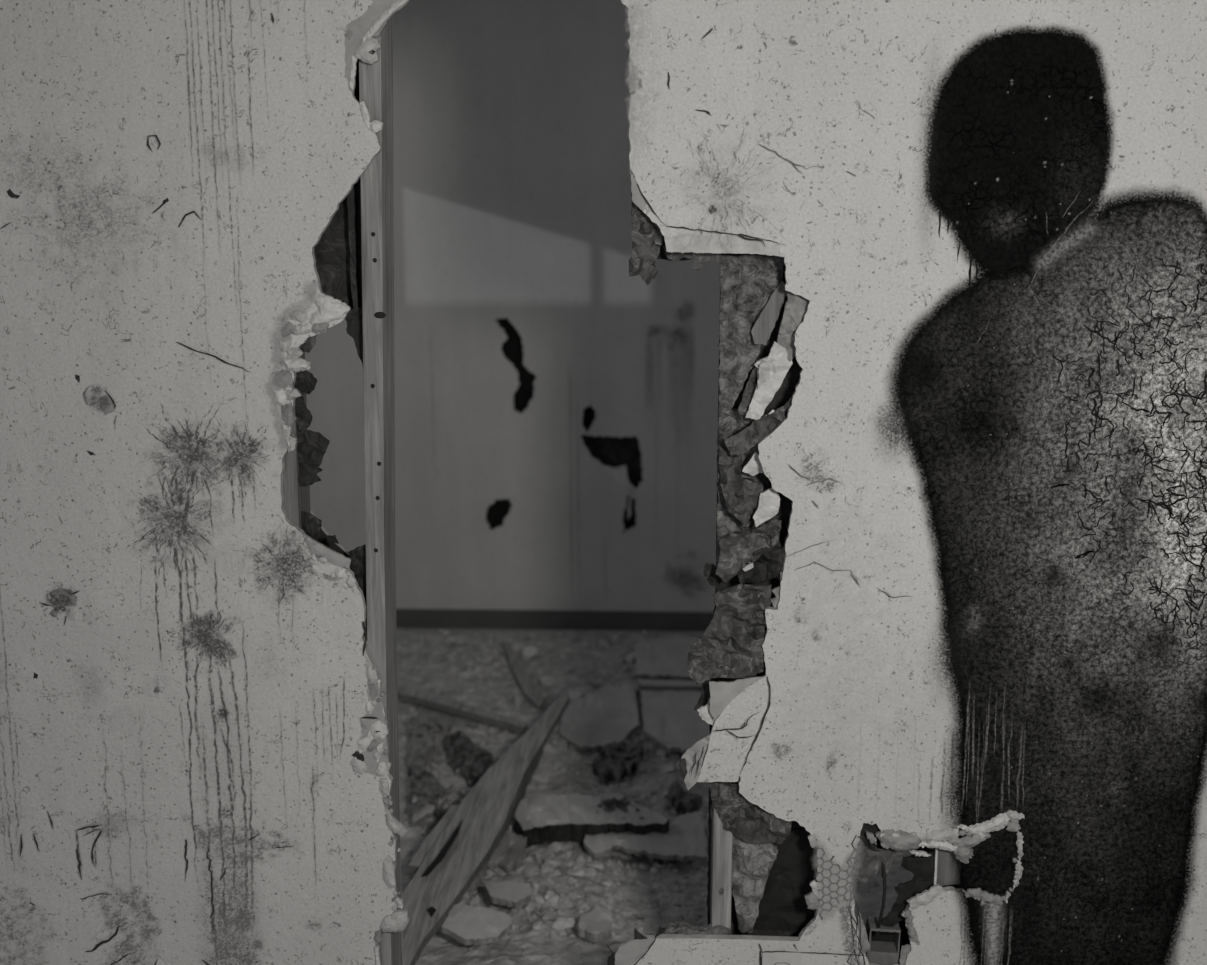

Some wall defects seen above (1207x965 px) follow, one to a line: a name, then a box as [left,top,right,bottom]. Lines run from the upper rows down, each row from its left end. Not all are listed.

water stain [185,0,266,167]
flaking render [345,0,409,133]
flaking render [664,226,788,257]
flaking render [267,284,351,452]
flaking render [293,531,356,589]
water stain [131,406,320,965]
peeling [697,703,715,725]
flaking render [350,621,409,965]
peeling [606,927,666,965]
flaking render [802,810,1025,965]